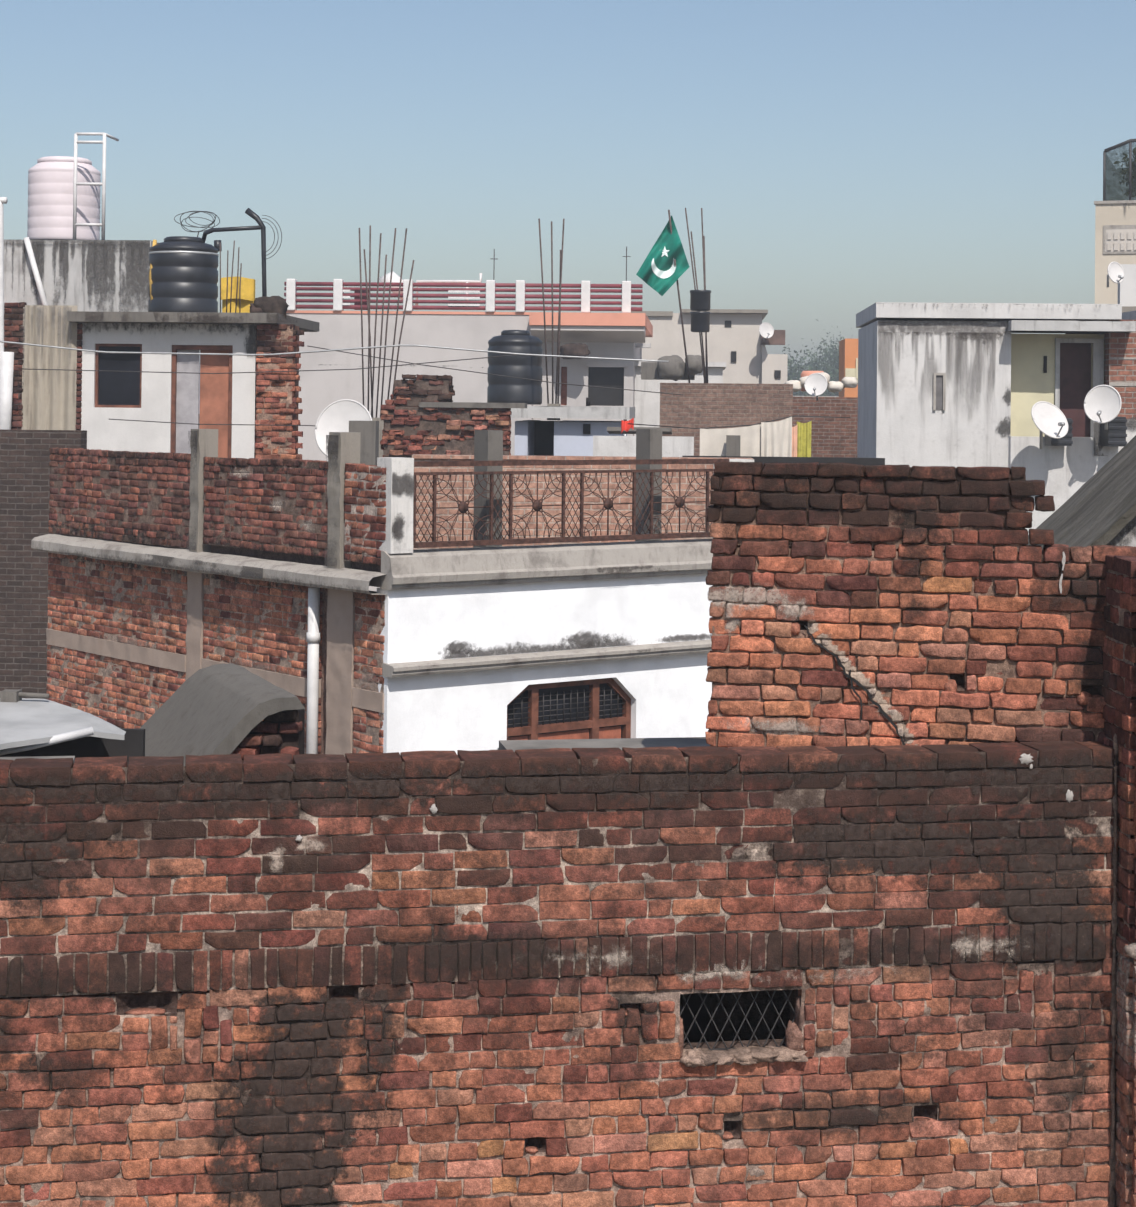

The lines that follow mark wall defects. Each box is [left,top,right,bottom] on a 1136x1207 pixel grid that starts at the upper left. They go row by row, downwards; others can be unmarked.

leakage [6,240,256,354]
mould [997,389,1011,437]
crack [804,621,918,745]